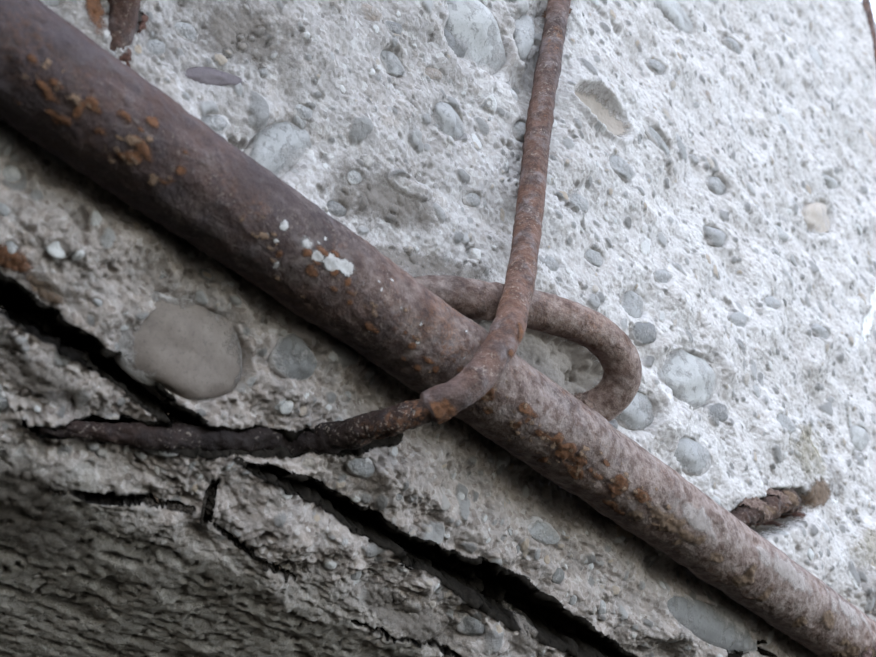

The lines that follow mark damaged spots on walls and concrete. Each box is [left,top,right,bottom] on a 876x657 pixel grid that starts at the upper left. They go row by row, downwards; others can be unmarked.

rust [86,0,106,35]
rust [0,244,63,304]
spalling [516,328,603,395]
crack [0,270,638,657]
spalling [749,492,807,538]
rust [751,479,831,528]
crack [727,640,777,657]